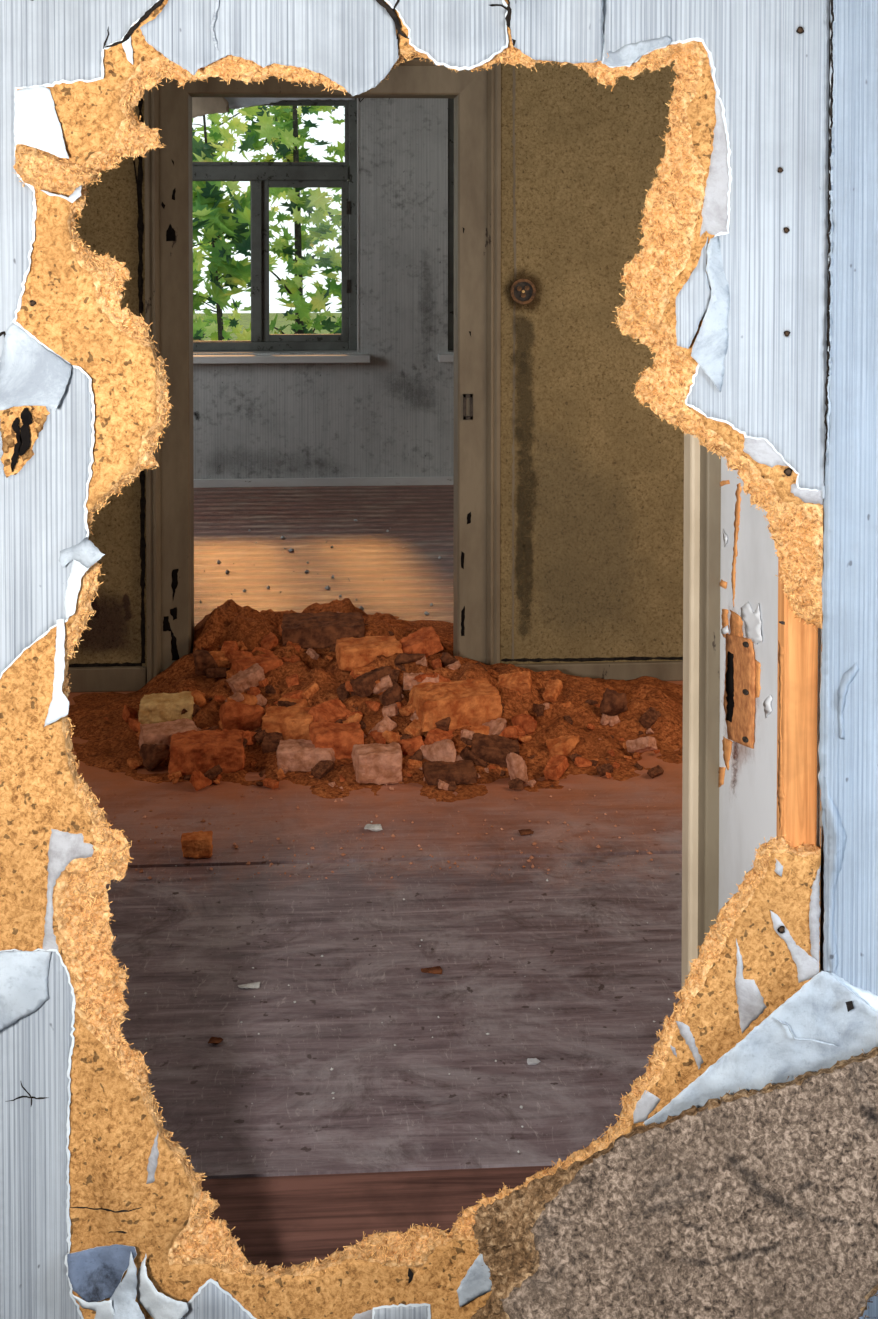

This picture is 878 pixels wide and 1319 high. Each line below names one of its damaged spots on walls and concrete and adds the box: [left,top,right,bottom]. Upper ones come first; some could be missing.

crack [376,0,409,44]
spalling [390,47,433,71]
spalling [0,406,48,478]
damp [79,594,131,650]
spalling [67,55,346,531]
damp [513,318,535,634]
spalling [472,38,823,645]
spalling [53,562,878,1319]